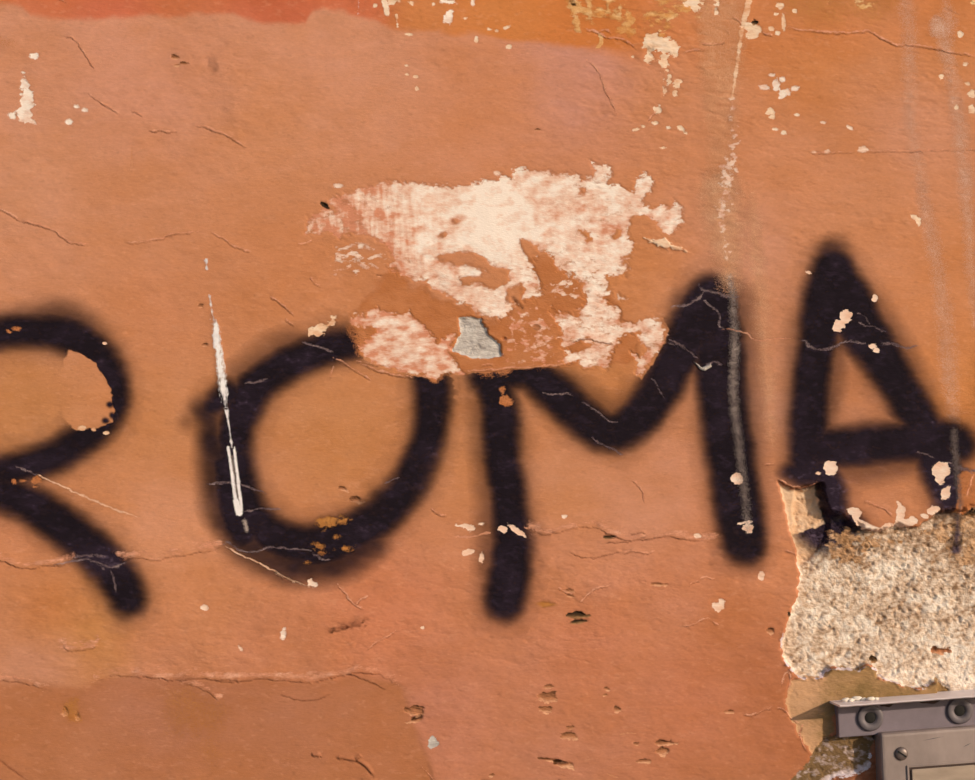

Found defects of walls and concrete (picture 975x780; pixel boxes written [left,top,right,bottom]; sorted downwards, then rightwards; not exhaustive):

crack [763,26,973,57]
peeling [7,72,36,125]
peeling [758,73,800,135]
peeling [305,161,688,407]
peeling [57,350,115,435]
crack [212,481,279,512]
crack [54,554,122,589]
crack [224,541,330,560]
flaking render [779,461,975,780]